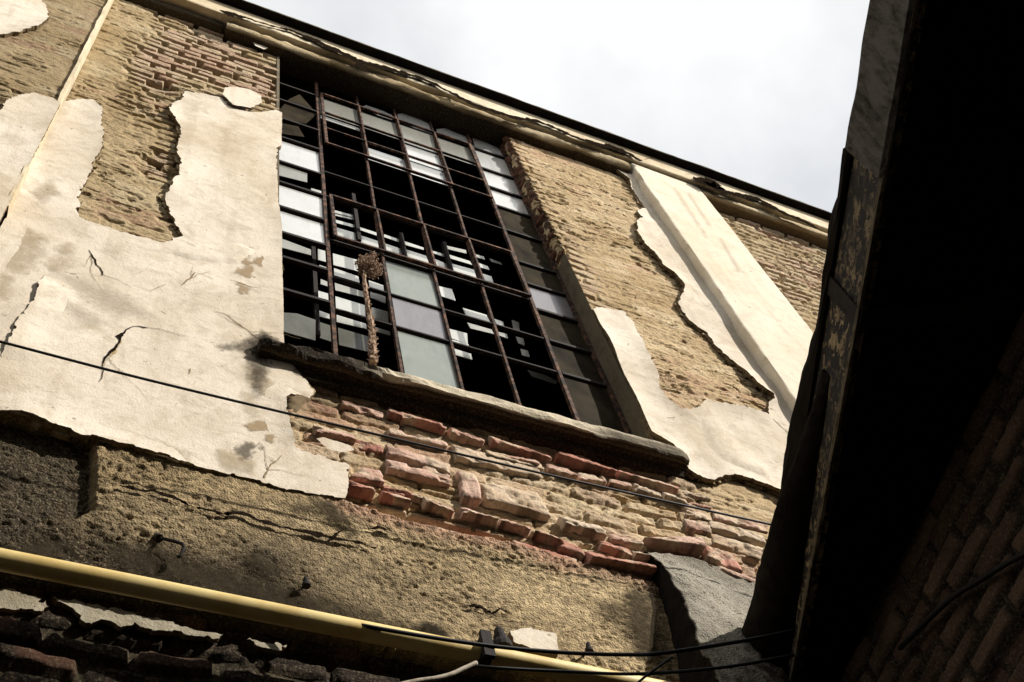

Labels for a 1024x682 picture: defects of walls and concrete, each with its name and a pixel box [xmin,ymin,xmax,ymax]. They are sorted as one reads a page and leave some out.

spalling [0,0,278,242]
crack [86,241,261,294]
spalling [504,137,769,413]
spalling [718,212,827,333]
crack [99,326,184,392]
crack [120,485,392,549]
spalling [286,386,779,582]
spalling [0,588,223,643]
spalling [246,638,287,655]